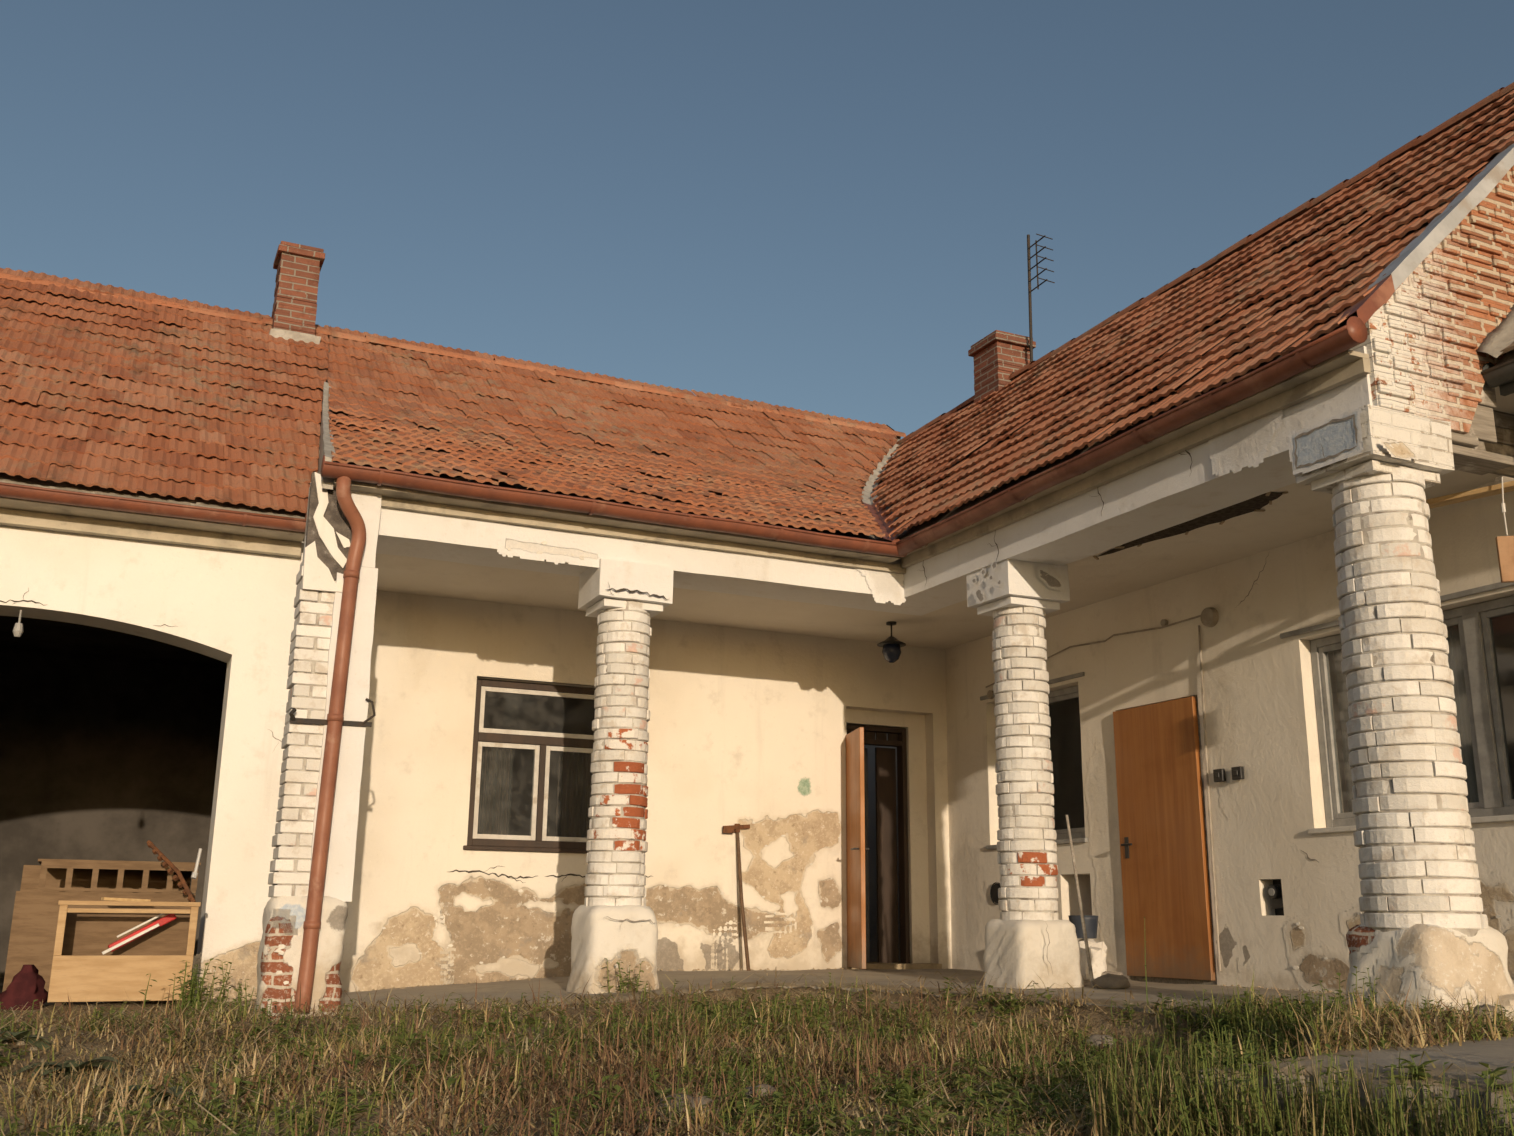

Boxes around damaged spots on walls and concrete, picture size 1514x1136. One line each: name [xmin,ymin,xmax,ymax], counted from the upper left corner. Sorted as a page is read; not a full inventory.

flaking render [593,729,648,853]
flaking render [190,869,588,1021]
flaking render [644,804,847,970]
flaking render [1007,852,1058,887]
peeling [1283,869,1514,1010]